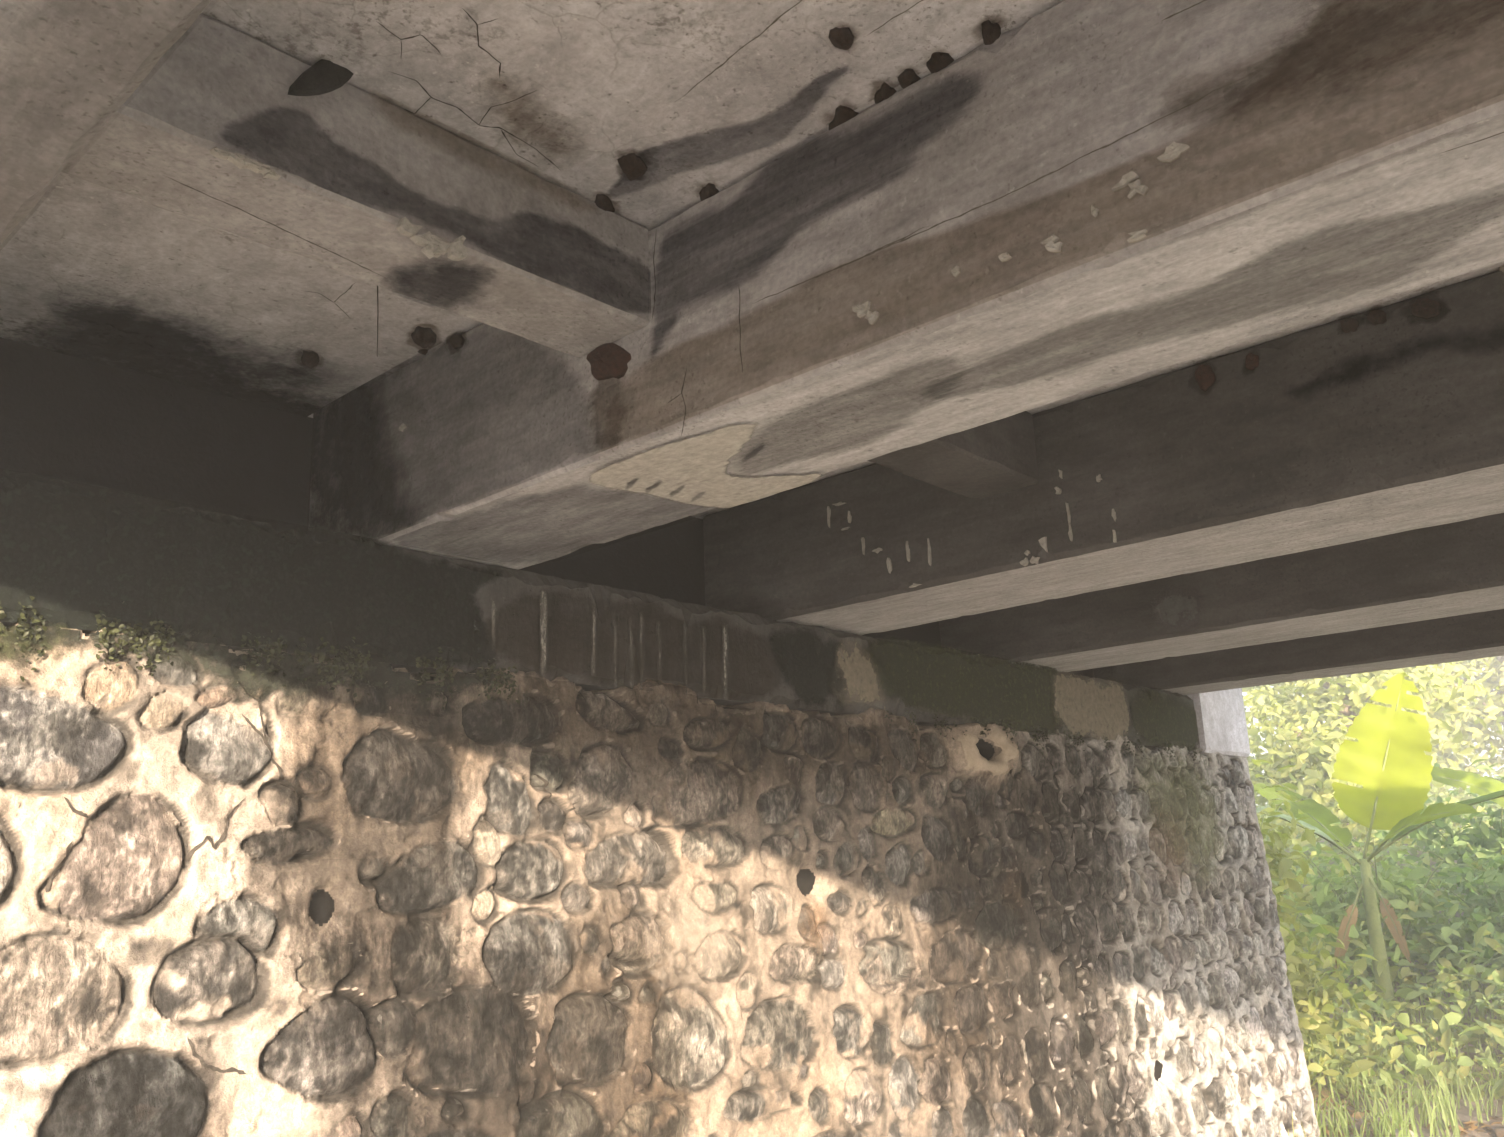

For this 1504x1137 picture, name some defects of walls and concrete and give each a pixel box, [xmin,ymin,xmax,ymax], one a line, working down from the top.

crack [376,8,561,171]
corrosion [828,27,854,50]
corrosion [829,105,859,130]
corrosion [874,52,954,104]
corrosion [982,20,1002,45]
leakage [659,81,974,274]
leakage [225,110,794,353]
corrosion [408,324,465,355]
corrosion [586,343,631,416]
peeling [590,424,820,508]
leakage [628,604,849,708]
leakage [0,307,554,1137]